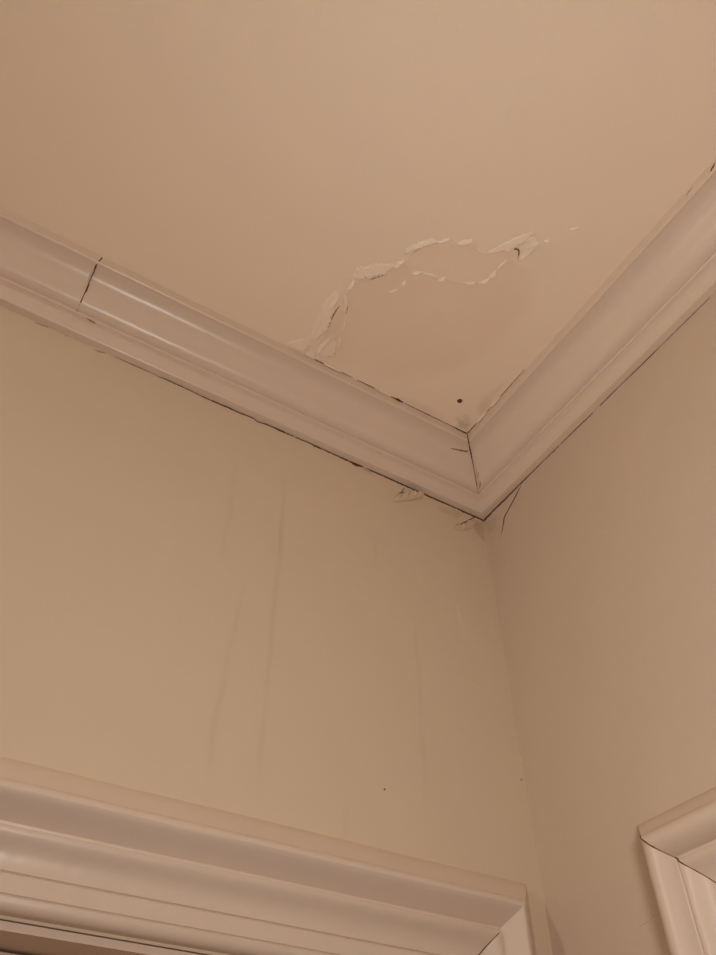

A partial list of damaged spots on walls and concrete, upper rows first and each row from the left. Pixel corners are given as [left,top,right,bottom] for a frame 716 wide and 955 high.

crack [77,258,102,310]
crack [96,299,709,535]